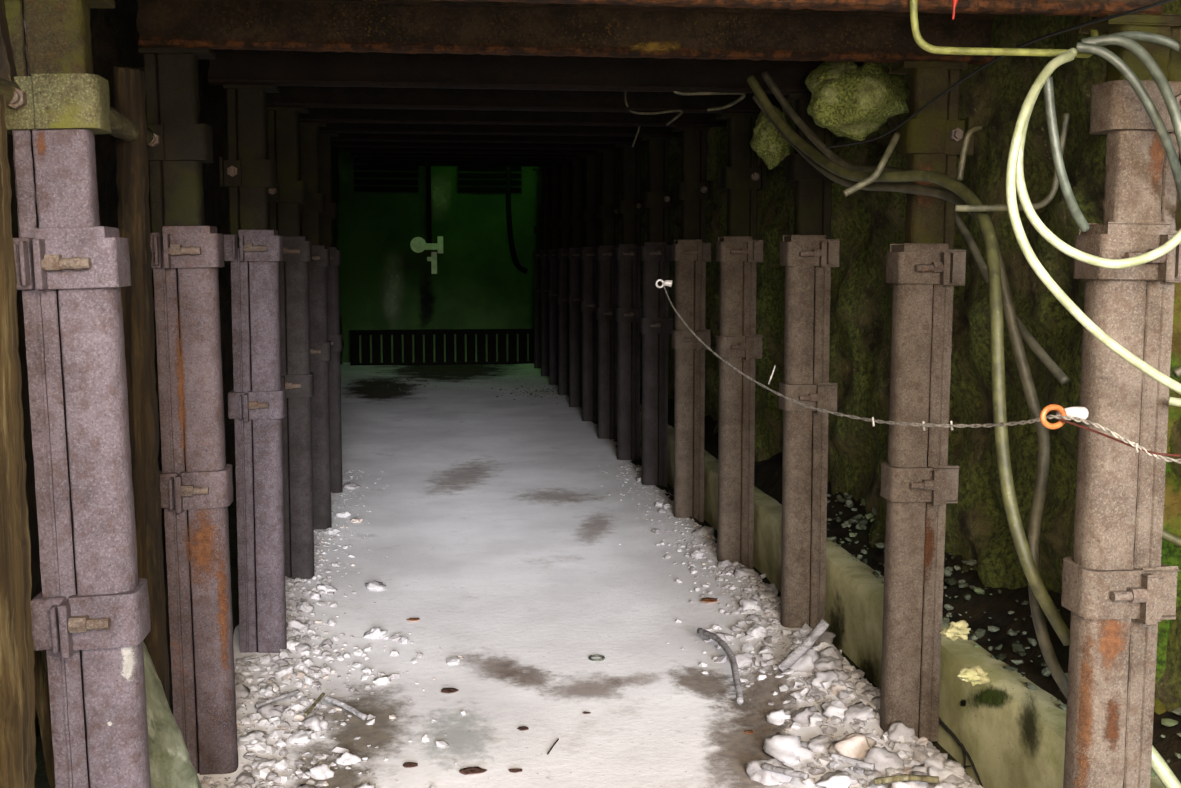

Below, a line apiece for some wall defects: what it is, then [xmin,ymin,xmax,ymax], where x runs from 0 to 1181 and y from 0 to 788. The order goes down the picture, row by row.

rust [185,509,229,671]
leakage [469,659,546,686]
leakage [560,679,620,697]
rust [1076,619,1126,788]